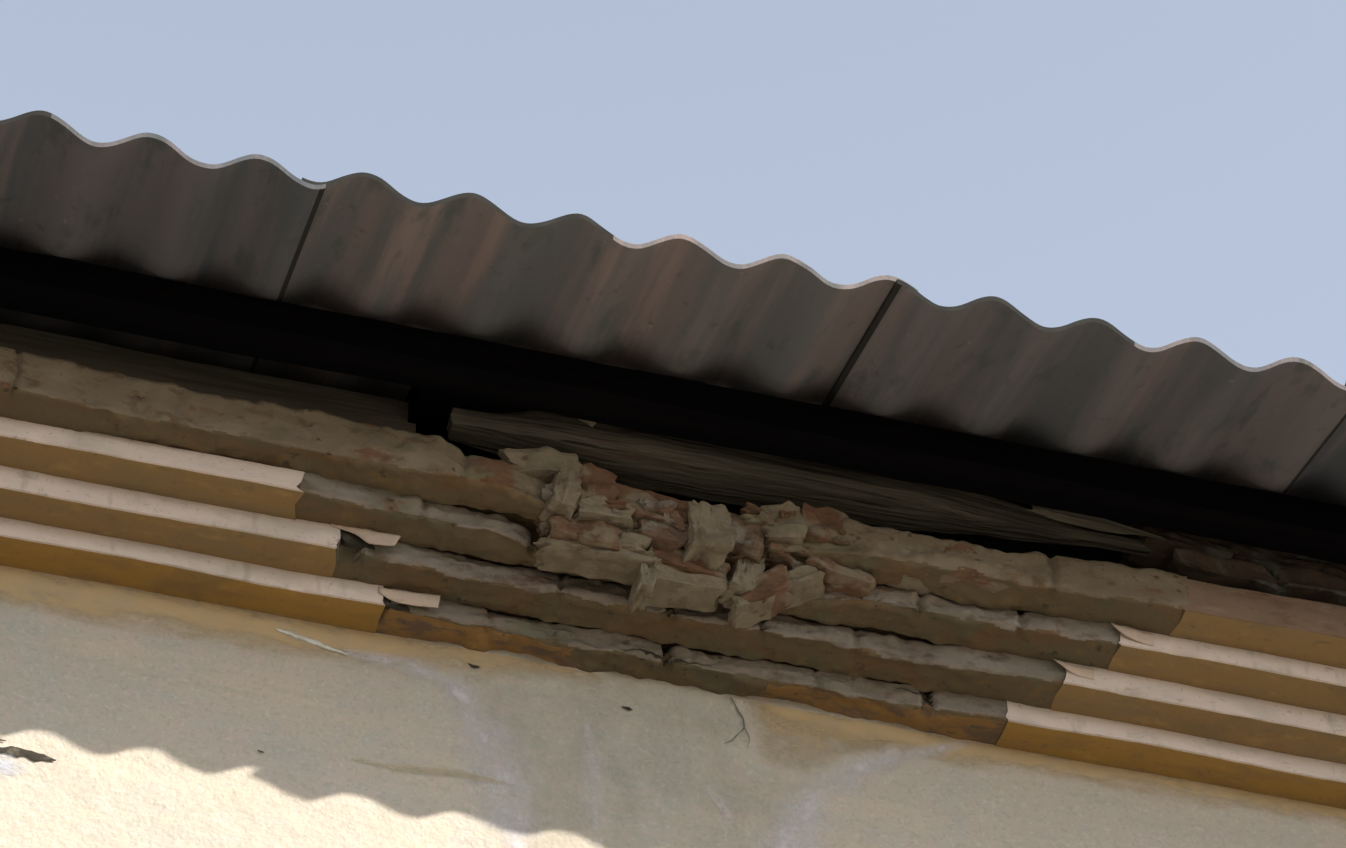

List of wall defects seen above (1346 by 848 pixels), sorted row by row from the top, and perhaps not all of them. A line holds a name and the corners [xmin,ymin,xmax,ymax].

spalling [0,346,1346,745]
crack [623,649,711,666]
crack [724,697,750,748]
crack [0,739,56,761]